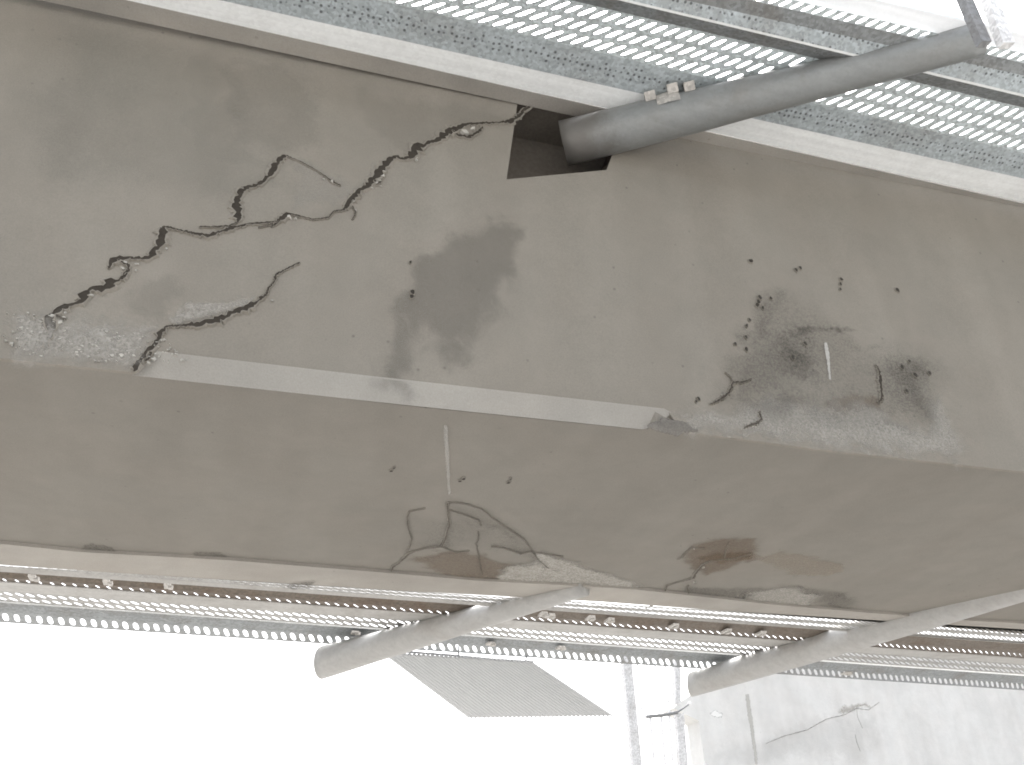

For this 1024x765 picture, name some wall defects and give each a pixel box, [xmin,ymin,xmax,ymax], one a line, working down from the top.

crack [37,106,534,349]
crack [129,262,300,373]
water stain [691,401,957,451]
crack [390,501,563,576]